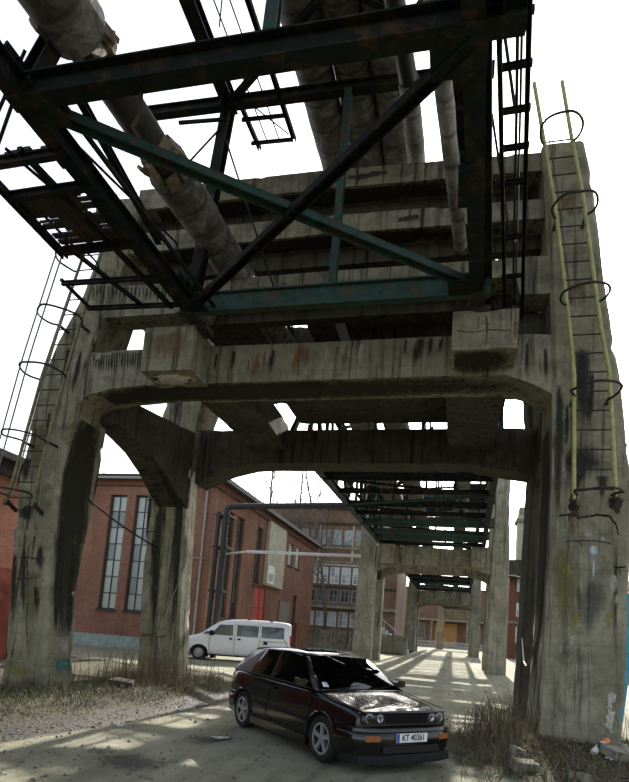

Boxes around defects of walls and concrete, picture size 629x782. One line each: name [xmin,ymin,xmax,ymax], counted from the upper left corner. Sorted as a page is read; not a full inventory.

water stain [93,352,141,372]
water stain [576,350,594,418]
water stain [54,420,99,649]
water stain [150,461,184,621]
water stain [532,388,607,688]
crack [559,513,619,548]